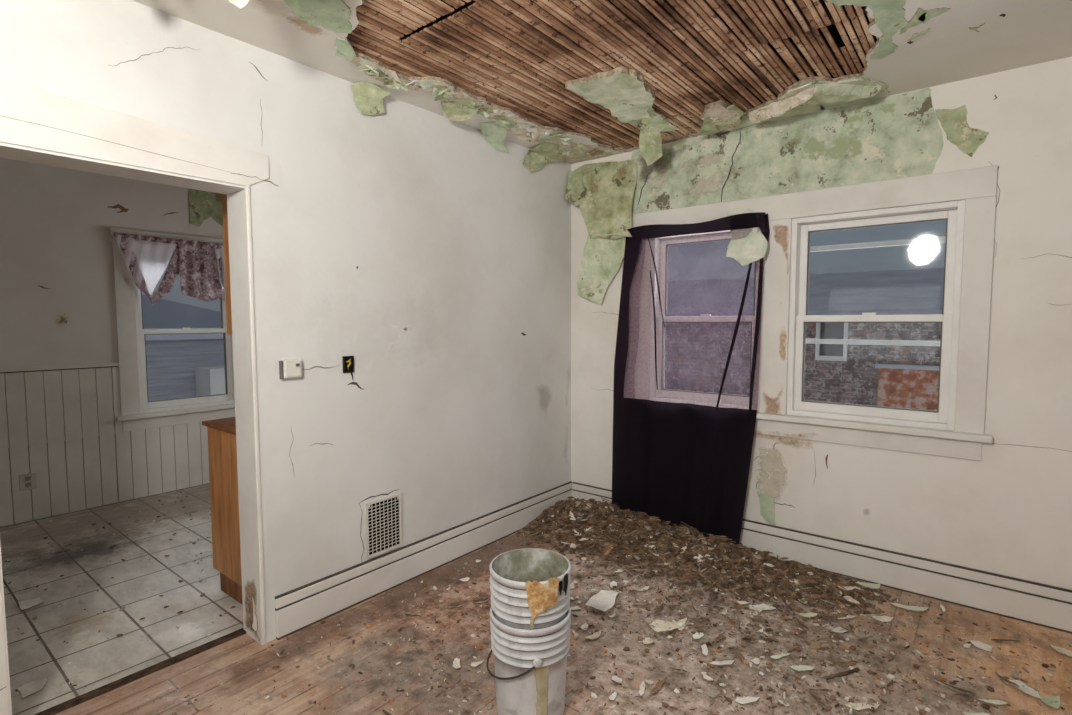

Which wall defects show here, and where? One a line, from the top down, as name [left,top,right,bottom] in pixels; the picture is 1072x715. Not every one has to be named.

peeling [229,0,250,8]
crack [109,47,196,66]
peeling [284,0,989,304]
peeling [757,491,795,526]